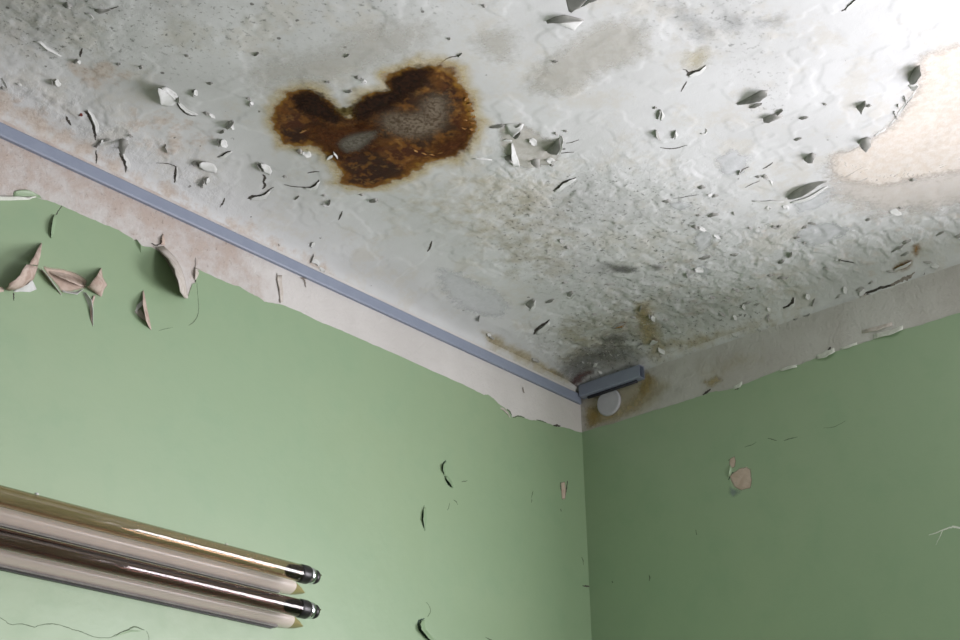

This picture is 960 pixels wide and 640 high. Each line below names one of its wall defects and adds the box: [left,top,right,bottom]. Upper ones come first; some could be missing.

peeling [118,134,133,173]
peeling [158,87,178,107]
peeling [191,120,234,188]
peeling [256,163,272,189]
rust [269,63,480,190]
peeling [489,123,578,169]
peeling [736,90,768,108]
peeling [752,45,960,221]
peeling [663,185,721,279]
peeling [0,243,107,326]
peeling [135,290,151,329]
spalling [134,234,188,298]